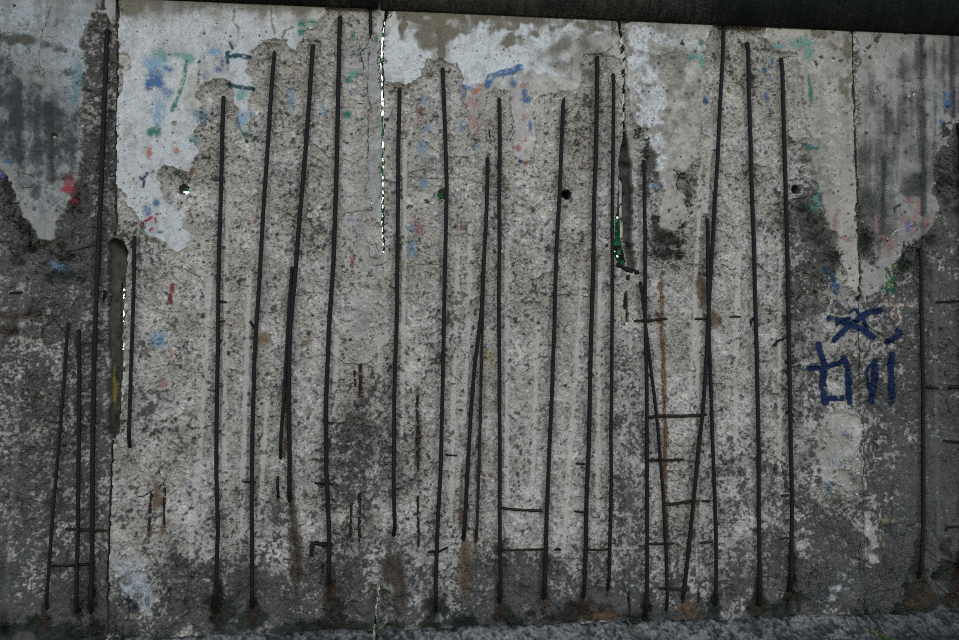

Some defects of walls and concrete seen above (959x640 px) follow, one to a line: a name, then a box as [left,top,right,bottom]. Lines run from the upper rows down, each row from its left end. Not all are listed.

leakage [0,34,87,199]
spalling [0,0,722,640]
crack [355,13,392,150]
crack [371,199,390,266]
spalling [680,25,959,621]
leakage [858,35,959,251]